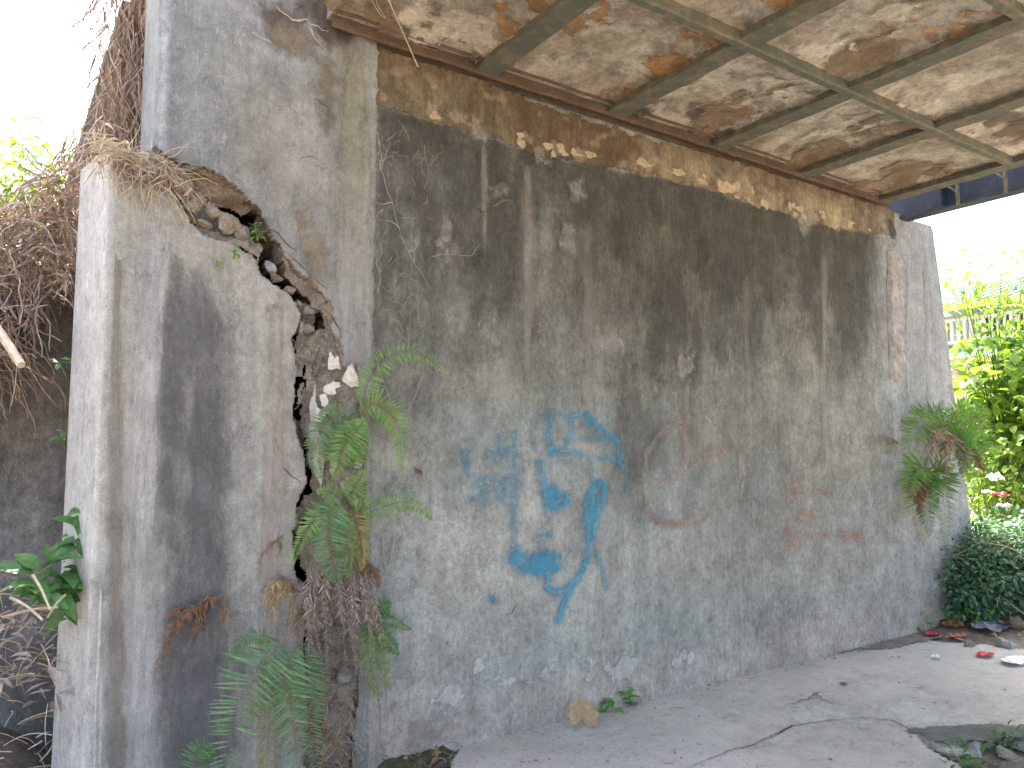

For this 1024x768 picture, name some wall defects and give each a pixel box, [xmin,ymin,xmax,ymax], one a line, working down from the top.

corrosion [263,0,437,129]
flaking render [376,49,897,237]
corrosion [689,89,774,138]
water stain [800,109,884,139]
corrosion [779,114,944,170]
corrosion [806,9,1006,78]
water stain [383,108,869,358]
crack [147,150,342,588]
water stain [127,206,230,768]
water stain [260,307,284,768]
crack [301,628,309,707]
crack [687,692,919,768]